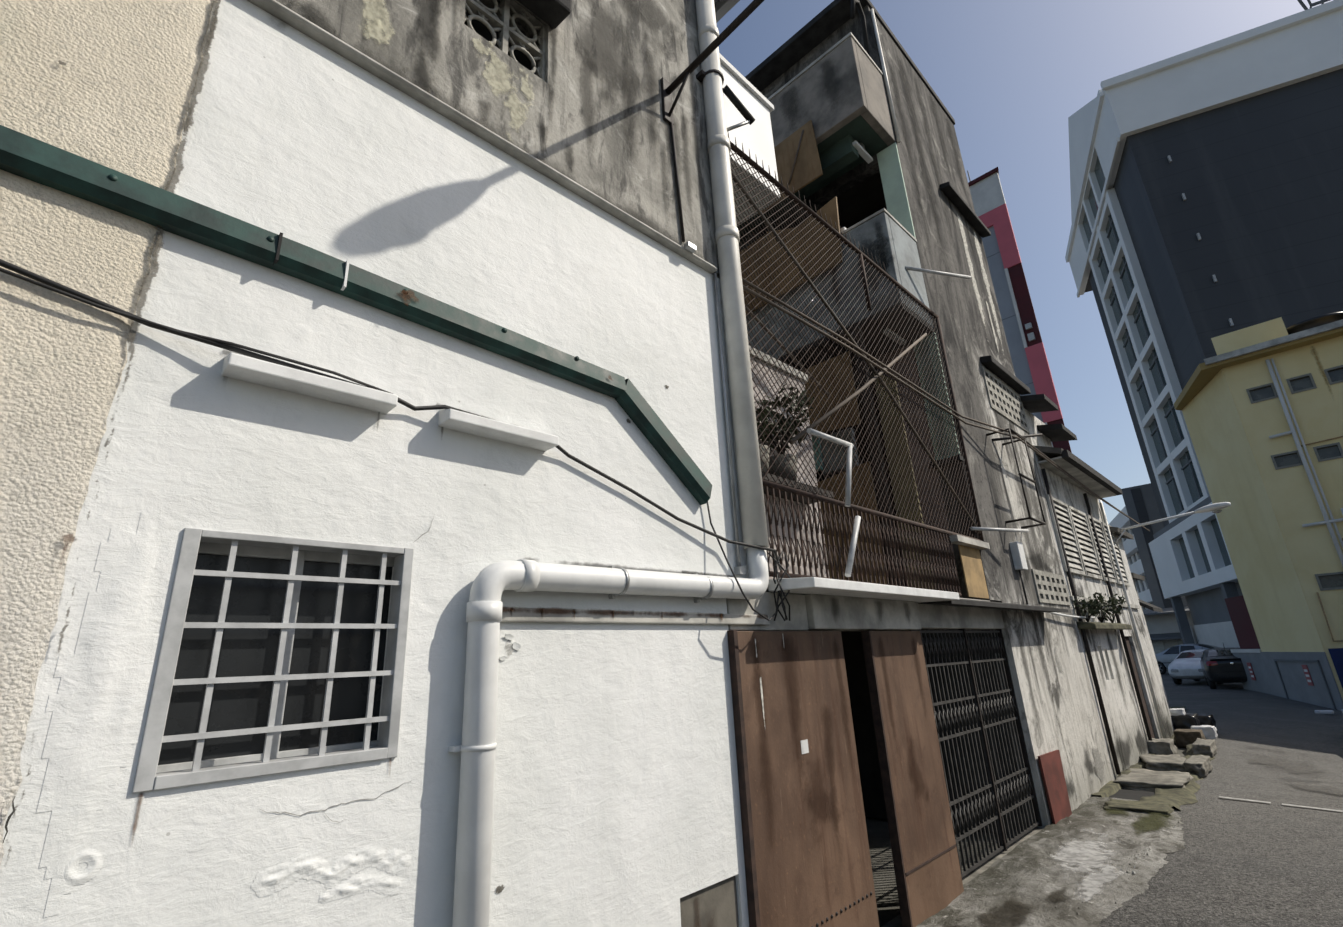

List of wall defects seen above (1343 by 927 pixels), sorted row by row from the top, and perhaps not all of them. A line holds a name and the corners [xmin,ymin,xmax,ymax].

water stain [417,0,439,88]
water stain [891,63,987,263]
corrosion [502,607,723,620]
water stain [1044,620,1060,707]
water stain [1092,631,1133,689]
water stain [1117,731,1148,766]
crack [260,781,411,822]